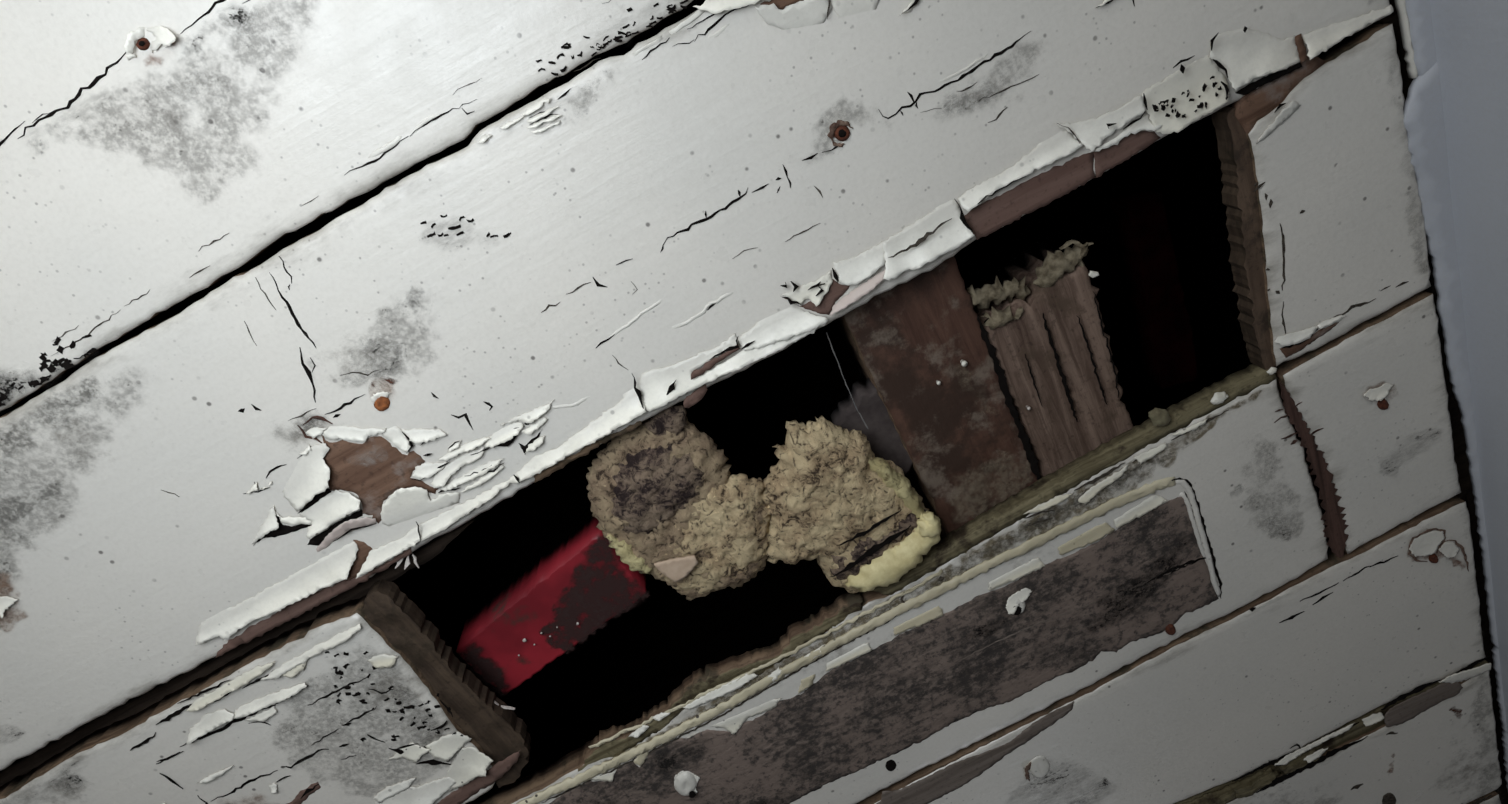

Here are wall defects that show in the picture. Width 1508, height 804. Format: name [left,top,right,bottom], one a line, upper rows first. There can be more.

crack [0,52,126,146]
crack [180,0,250,34]
peeling [693,0,879,30]
crack [878,31,1039,123]
crack [541,146,838,370]
damp [0,335,99,407]
peeling [195,5,1394,658]
damp [926,390,1261,589]
crack [157,678,393,804]
peeling [130,623,520,804]
damp [647,599,901,742]
peeling [549,497,1219,804]